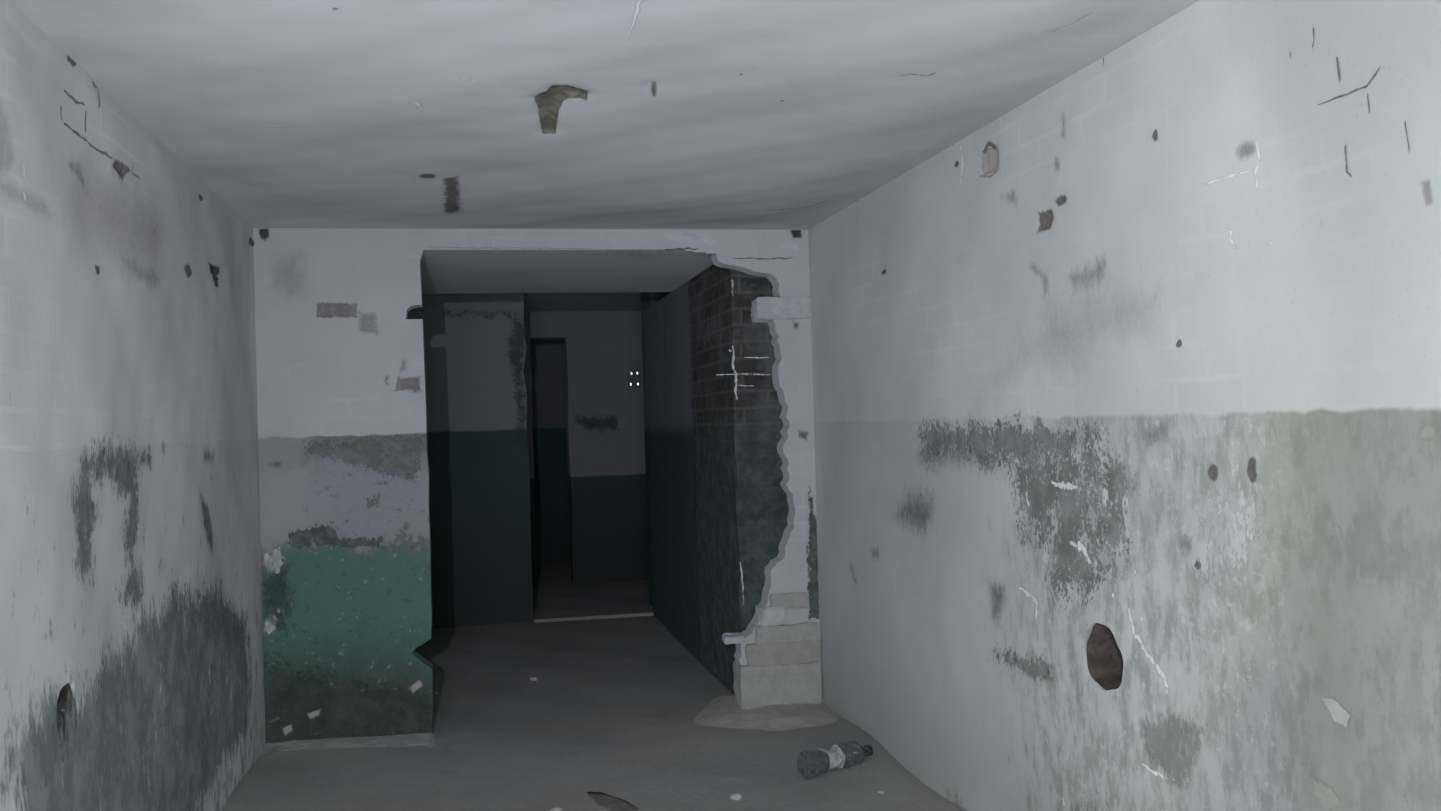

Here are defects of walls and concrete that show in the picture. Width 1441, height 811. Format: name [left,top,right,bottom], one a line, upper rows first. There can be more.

flaking render [535,85,588,134]
spalling [751,296,812,323]
peeling [917,412,1135,620]
peeling [995,649,1053,681]
spalling [1086,623,1123,690]